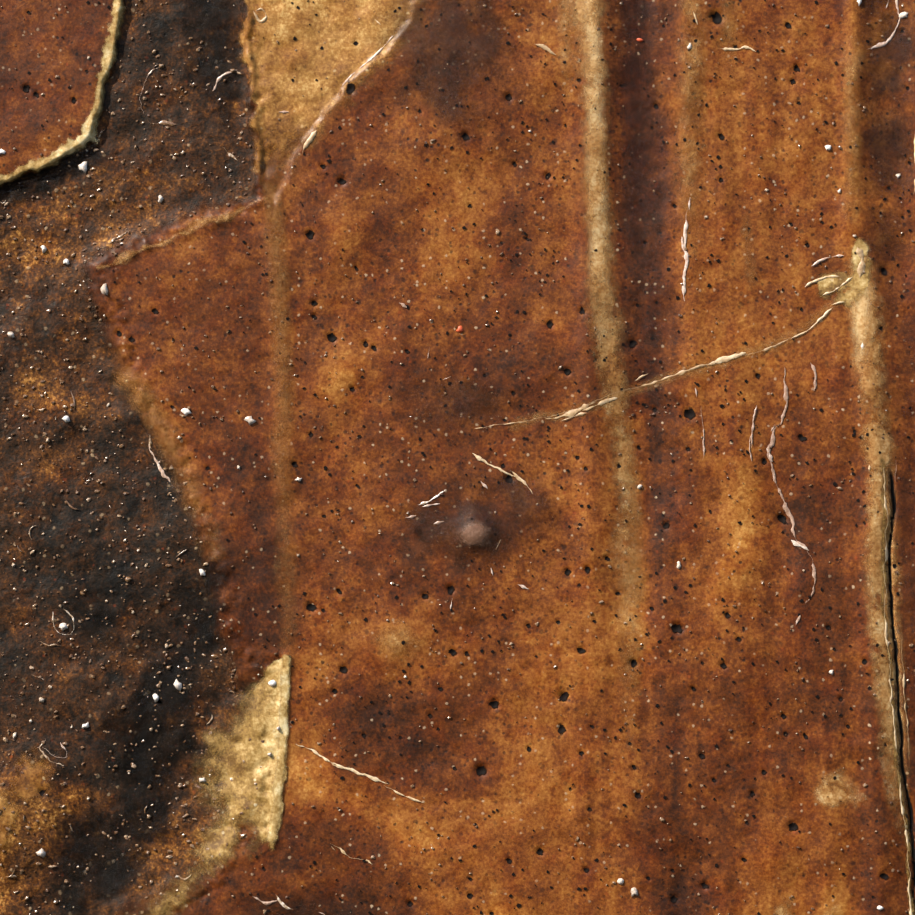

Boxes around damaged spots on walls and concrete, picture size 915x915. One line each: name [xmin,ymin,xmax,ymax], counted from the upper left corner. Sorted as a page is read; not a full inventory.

spalling [0,0,418,915]
leakage [563,0,634,493]
crack [749,370,816,596]
crack [809,362,817,391]
leakage [849,257,902,771]
crack [881,459,915,915]